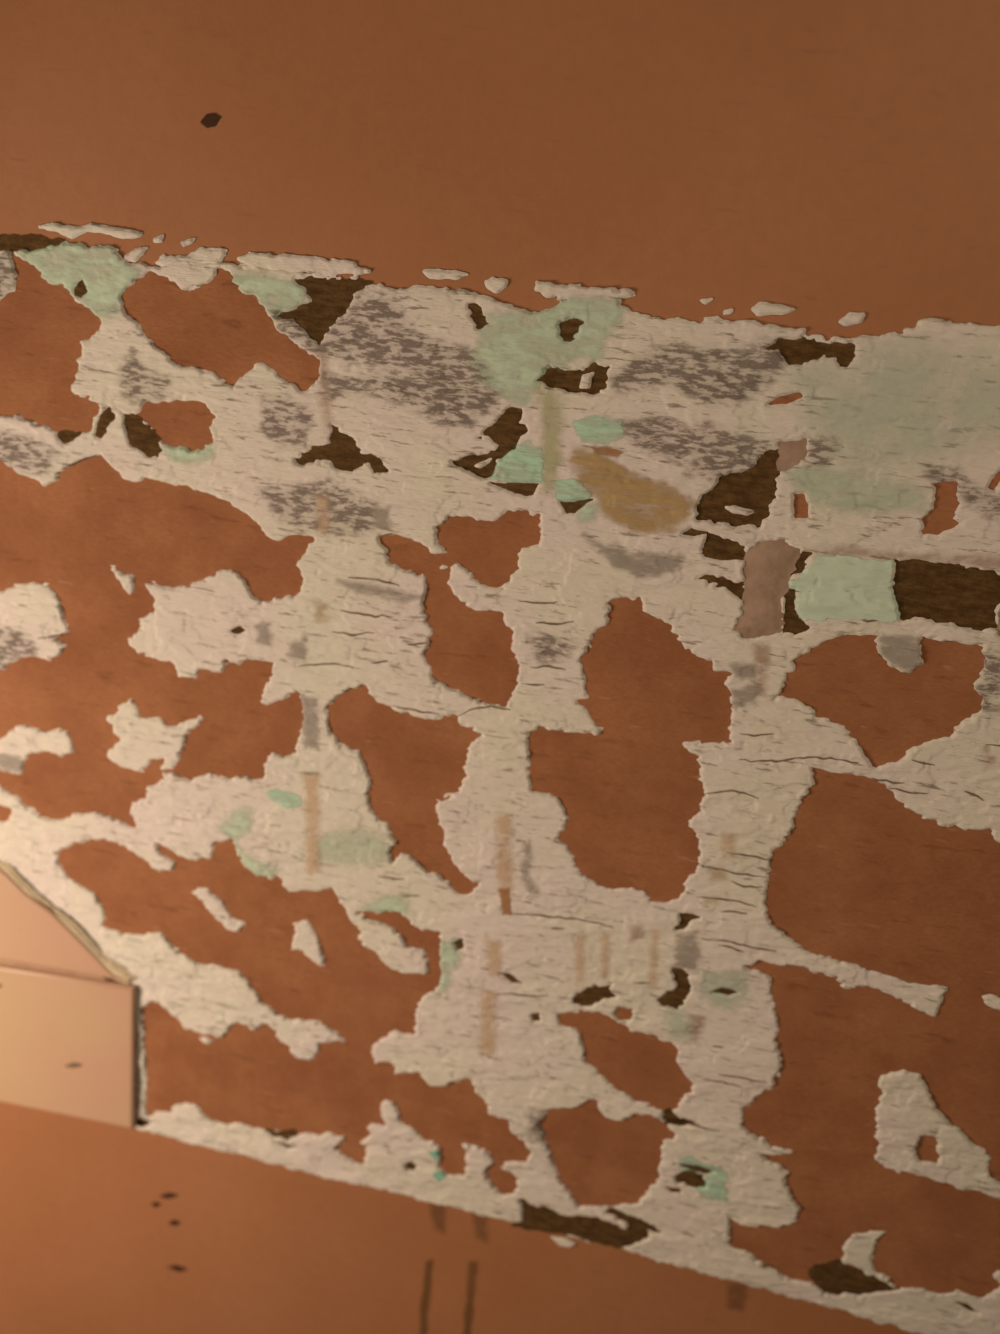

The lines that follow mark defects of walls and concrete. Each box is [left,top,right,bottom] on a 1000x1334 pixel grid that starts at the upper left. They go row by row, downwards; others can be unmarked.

peeling [0,455,314,828]
peeling [0,223,373,458]
spalling [295,425,389,473]
peeling [380,407,541,707]
spalling [536,362,610,395]
spalling [683,449,780,600]
spalling [765,336,856,367]
peeling [921,481,960,535]
peeling [327,685,482,895]
peeling [528,597,733,930]
peeling [55,838,712,1249]
peeling [728,551,1000,1312]